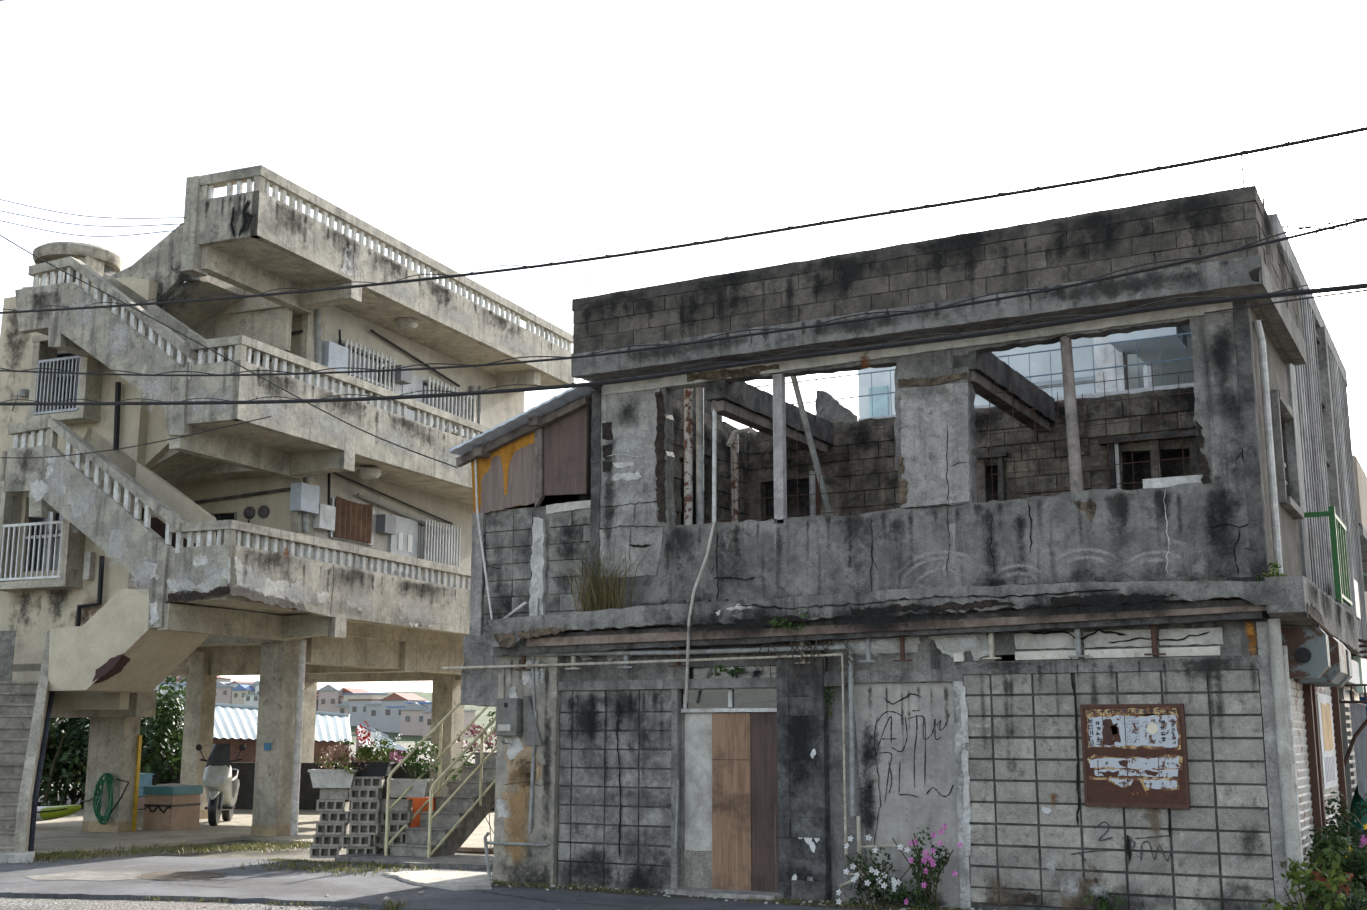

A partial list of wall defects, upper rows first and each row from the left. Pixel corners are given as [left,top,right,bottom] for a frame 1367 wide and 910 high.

water stain [927,232,989,279]
water stain [1056,197,1222,255]
water stain [628,273,748,359]
peeling [29,455,84,520]
crack [1162,493,1170,573]
crack [1208,523,1249,573]
peeling [141,553,330,625]
peeling [509,660,543,698]
peeling [870,633,989,661]
water stain [568,692,663,742]
peeling [496,736,542,836]
water stain [543,712,551,813]